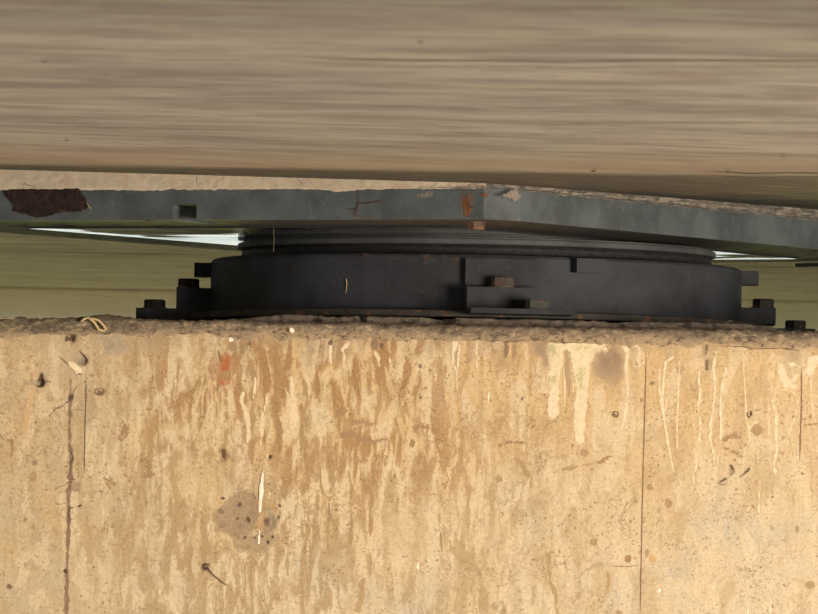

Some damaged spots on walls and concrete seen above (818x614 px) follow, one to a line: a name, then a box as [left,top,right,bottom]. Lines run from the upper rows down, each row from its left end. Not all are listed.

damp [95,334,135,360]
corrosion [217,350,235,389]
damp [218,389,234,463]
damp [239,340,334,501]
damp [329,342,391,444]
damp [452,341,460,388]
damp [530,341,640,444]
damp [658,356,680,471]
damp [689,351,750,492]
damp [771,352,818,477]
damp [166,452,184,570]
damp [348,454,379,544]